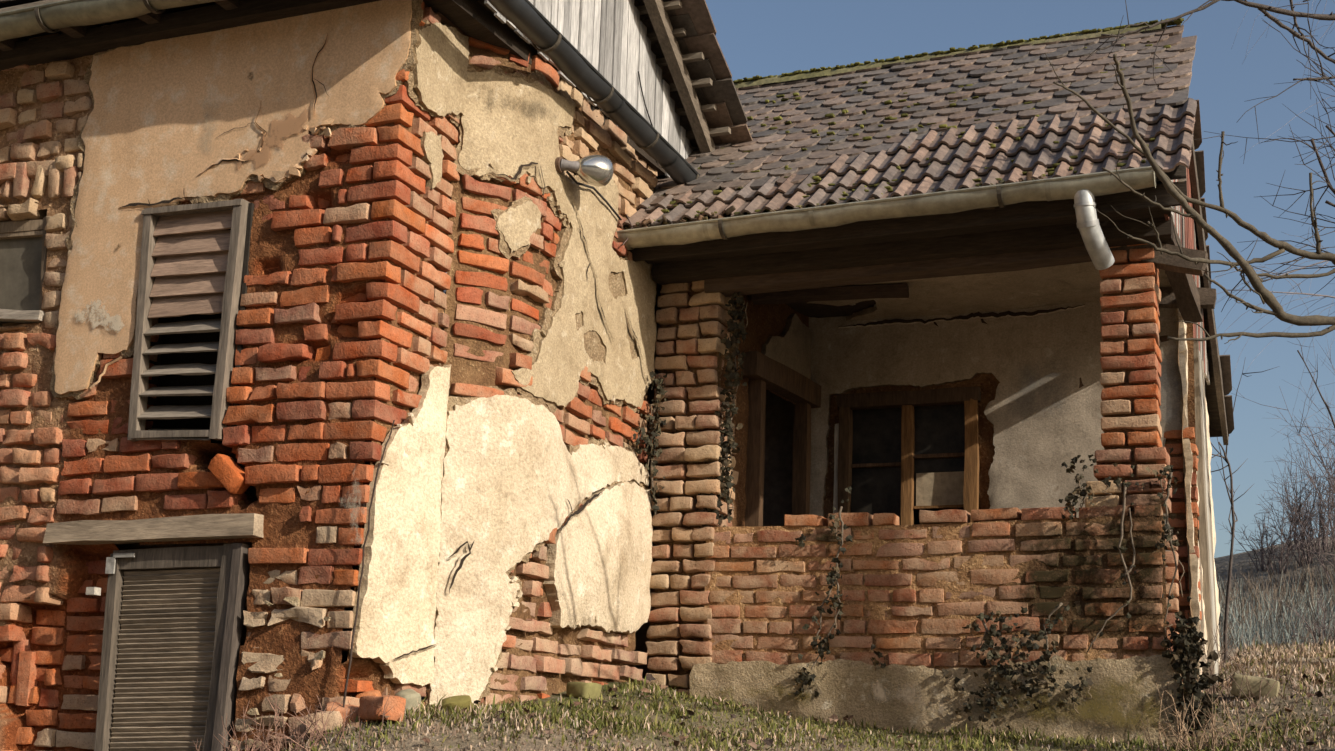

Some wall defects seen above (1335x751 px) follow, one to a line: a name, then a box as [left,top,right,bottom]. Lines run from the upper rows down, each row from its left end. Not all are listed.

crack [310,34,329,110]
flaking render [419,2,658,260]
crack [838,304,1085,329]
flaking render [55,69,572,751]
flaking render [545,366,653,473]
crack [560,492,603,531]
flaking render [481,504,647,705]